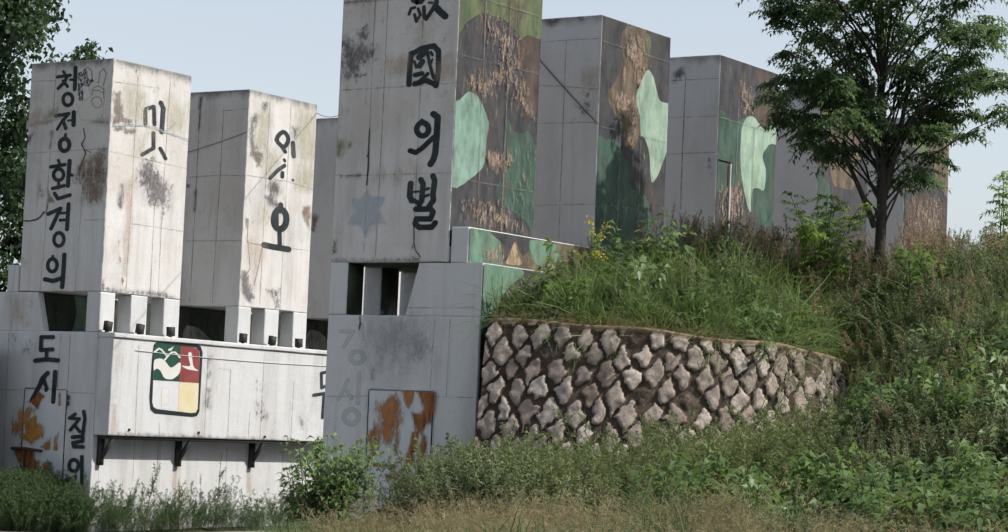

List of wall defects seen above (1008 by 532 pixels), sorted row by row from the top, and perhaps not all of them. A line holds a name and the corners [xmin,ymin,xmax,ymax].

rust [11,391,58,479]
rust [368,391,436,480]